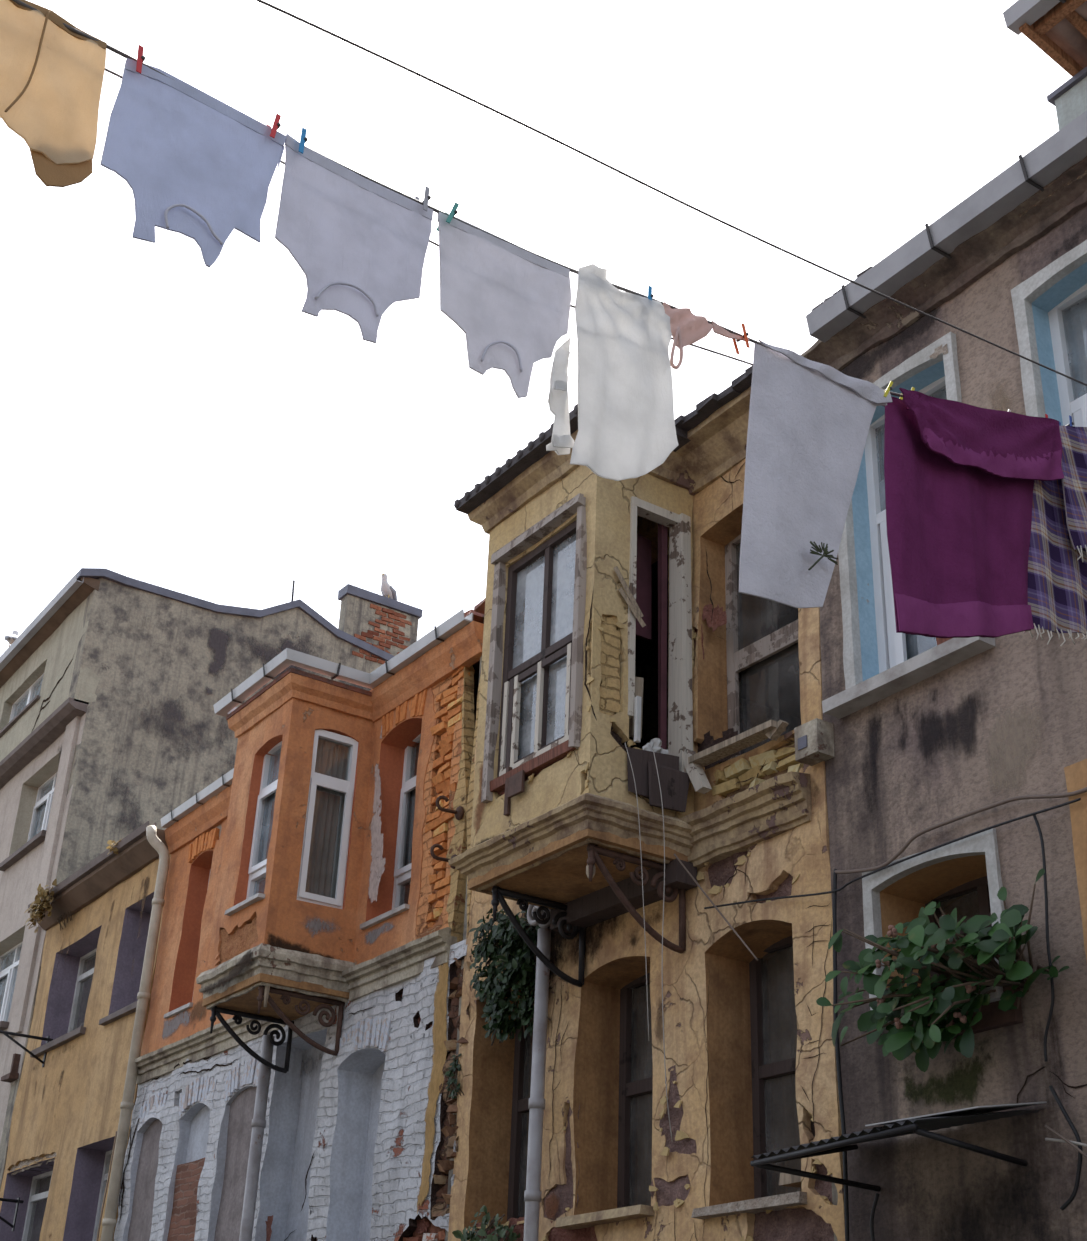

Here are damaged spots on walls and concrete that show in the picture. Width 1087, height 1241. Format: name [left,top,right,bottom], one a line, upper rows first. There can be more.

water stain [206,627,230,695]
water stain [248,638,315,678]
flaking render [352,604,412,664]
crack [584,586,597,720]
flaking render [705,744,804,797]
water stain [863,717,881,809]
water stain [919,695,980,759]
peeling [368,764,386,902]
crack [720,861,746,902]
crack [801,905,832,1140]
flaking render [541,1104,597,1241]
flaking render [740,1159,834,1241]